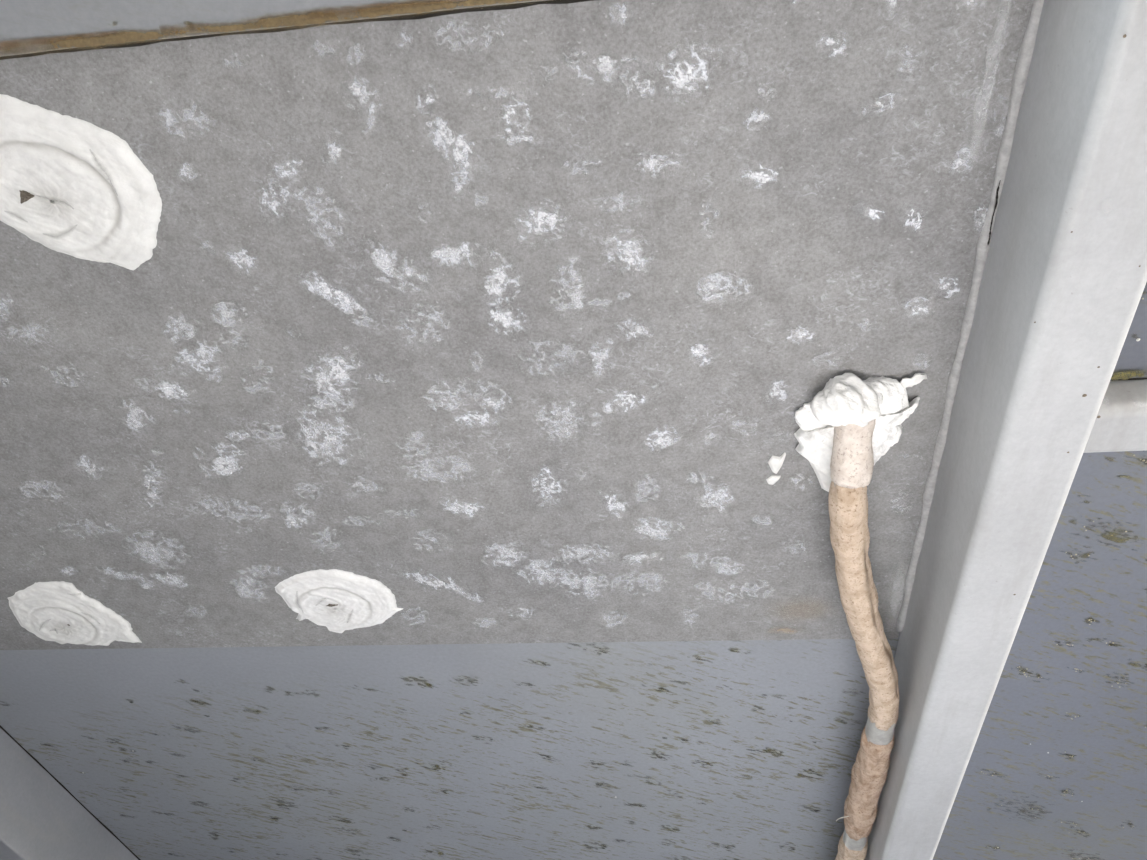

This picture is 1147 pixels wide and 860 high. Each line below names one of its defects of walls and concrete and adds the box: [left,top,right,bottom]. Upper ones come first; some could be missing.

leakage [574,45,708,94]
leakage [430,118,474,191]
leakage [742,164,778,187]
leakage [261,160,342,241]
leakage [519,203,560,240]
leakage [433,244,471,264]
leakage [303,272,365,324]
leakage [155,320,219,398]
leakage [300,357,359,464]
leakage [426,383,506,425]
leakage [203,432,249,475]
leakage [406,569,479,601]